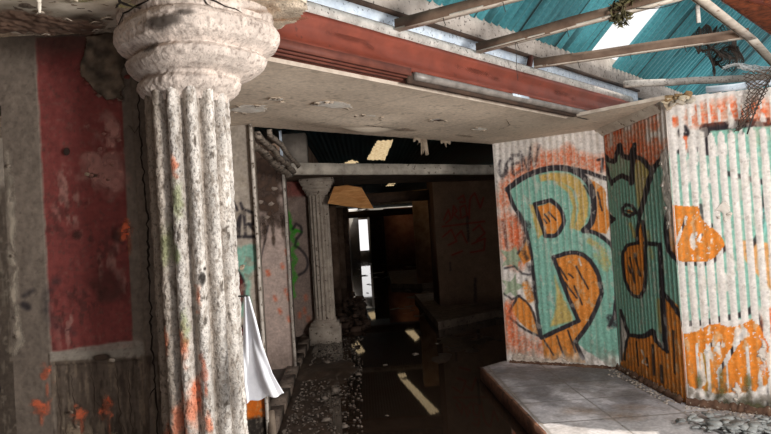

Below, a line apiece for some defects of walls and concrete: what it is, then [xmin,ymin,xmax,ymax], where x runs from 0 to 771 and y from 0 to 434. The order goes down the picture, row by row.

crack [115,0,149,25]
crack [204,0,242,13]
corrosion [723,0,771,34]
leakage [256,142,285,245]